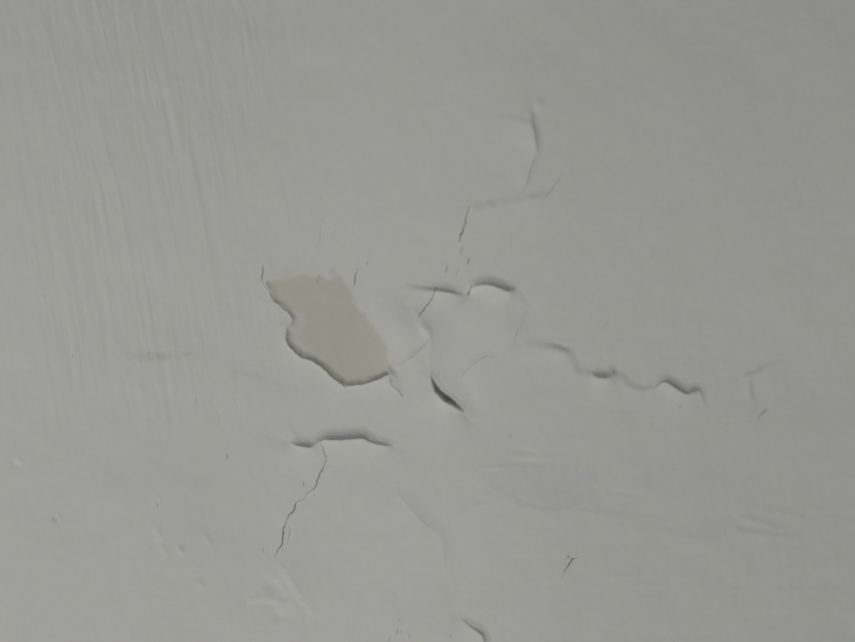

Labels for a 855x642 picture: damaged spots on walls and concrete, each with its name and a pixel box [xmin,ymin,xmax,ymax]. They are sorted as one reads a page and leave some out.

crack [456,91,551,246]
peeling [259,258,396,393]
crack [272,439,329,560]